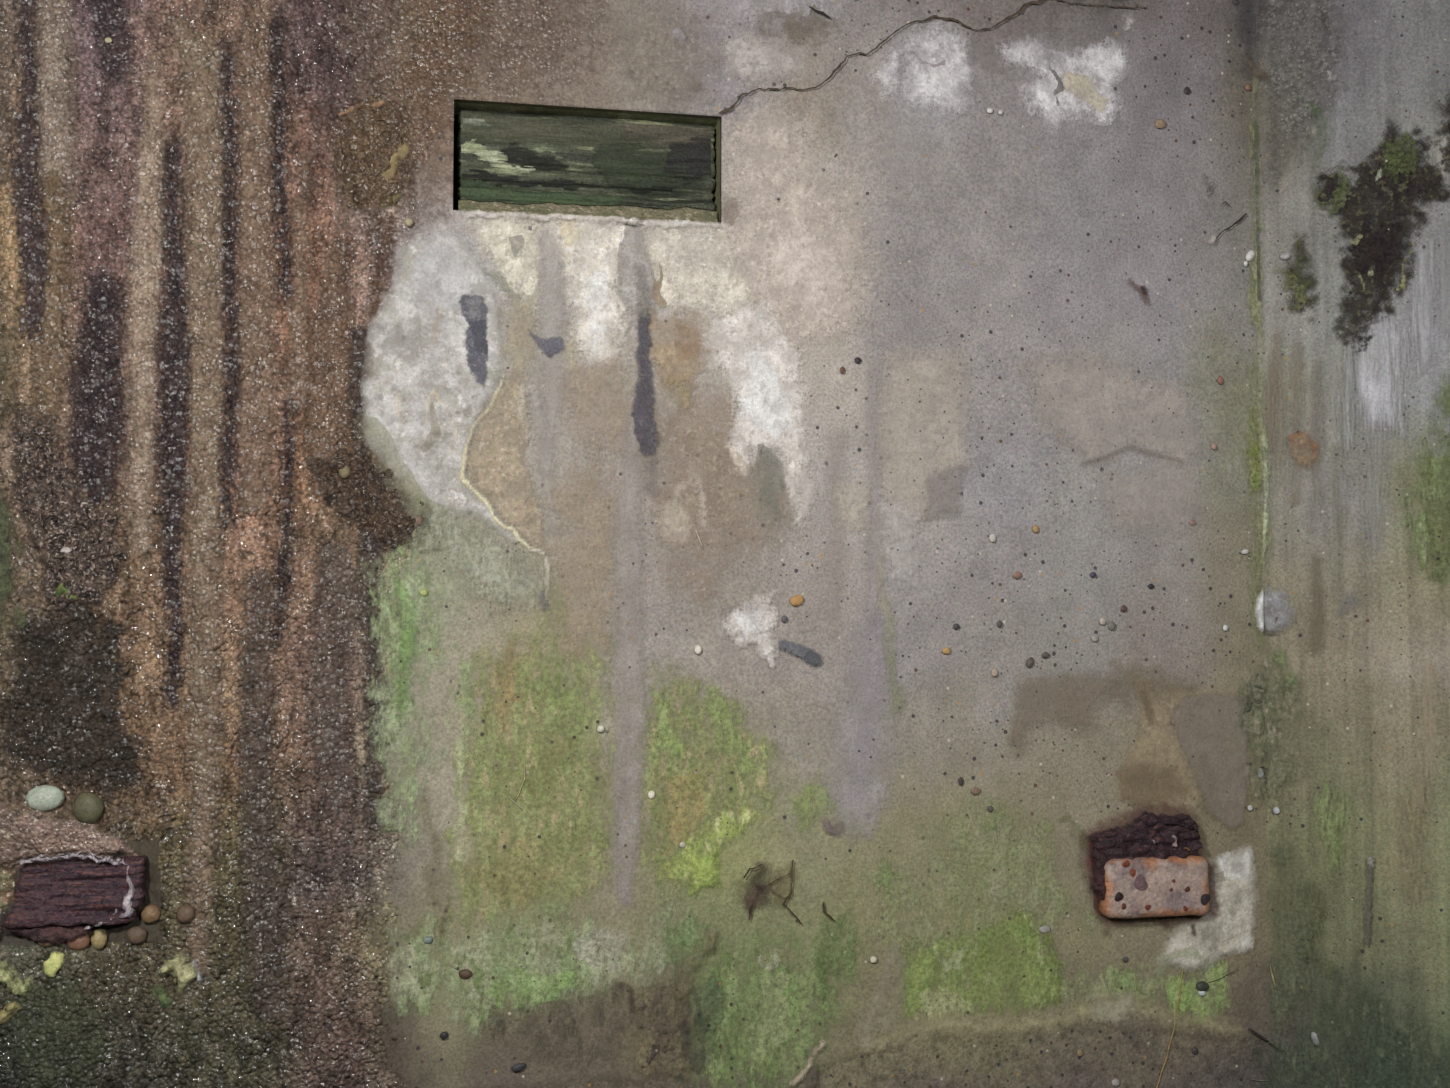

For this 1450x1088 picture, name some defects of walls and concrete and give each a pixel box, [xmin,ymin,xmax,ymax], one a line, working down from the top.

crack [719,0,1148,114]
water stain [873,19,1131,126]
water stain [1429,135,1447,176]
peeling [308,235,558,585]
water stain [459,100,864,903]
water stain [1314,226,1450,548]
water stain [831,628,894,830]
corrosion [1084,802,1217,935]